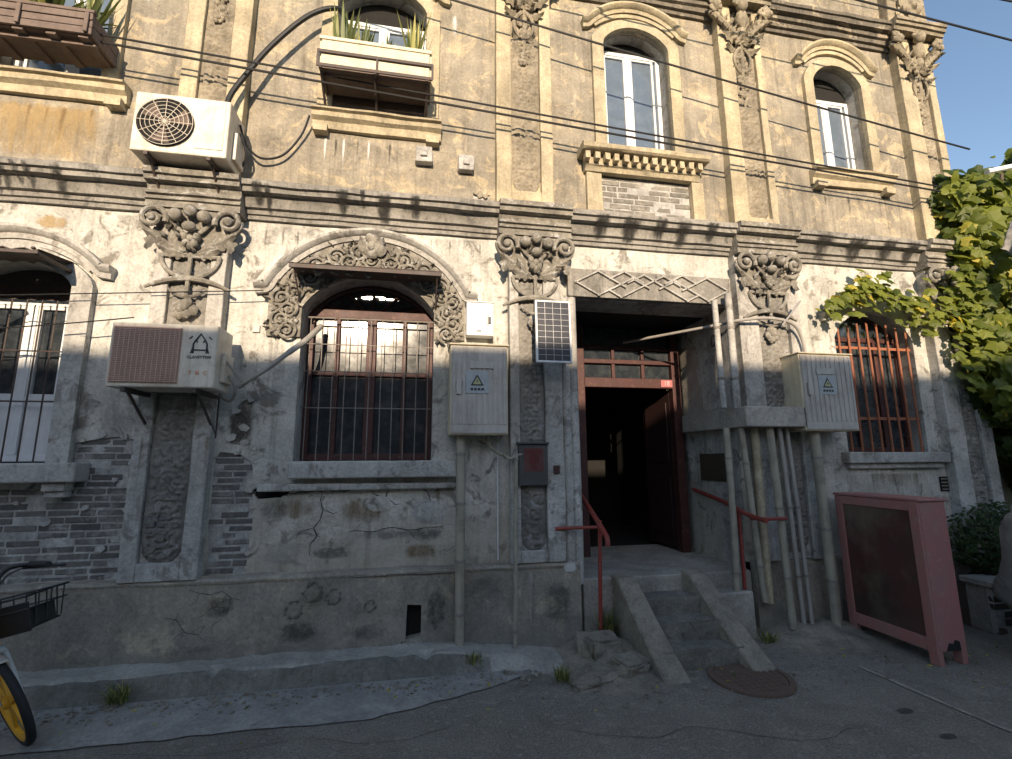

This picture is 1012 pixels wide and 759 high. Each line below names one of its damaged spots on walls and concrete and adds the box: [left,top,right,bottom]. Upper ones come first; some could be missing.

water stain [0,159,33,191]
water stain [49,165,66,195]
flaking render [0,431,133,585]
flaking render [204,396,290,574]
crack [265,490,450,556]
crack [348,571,450,579]